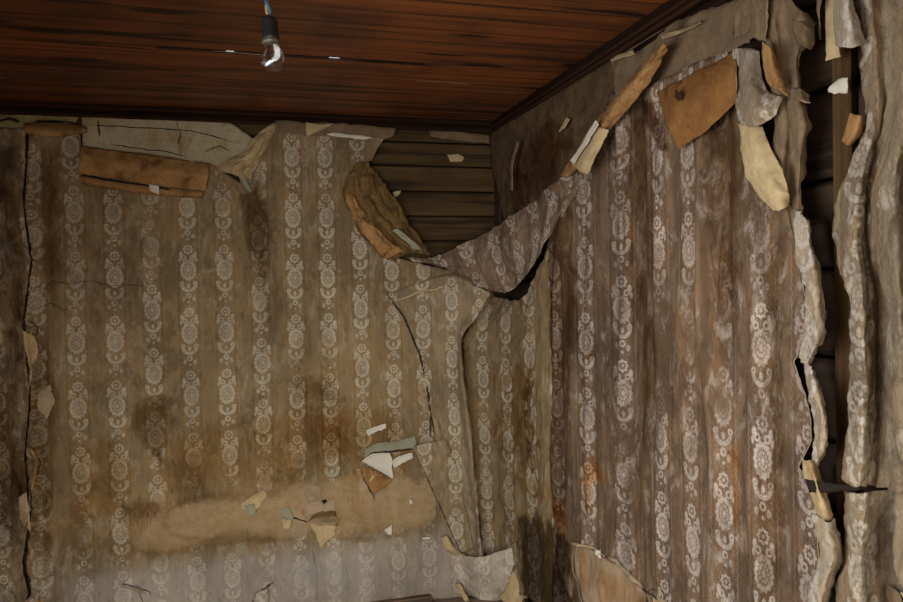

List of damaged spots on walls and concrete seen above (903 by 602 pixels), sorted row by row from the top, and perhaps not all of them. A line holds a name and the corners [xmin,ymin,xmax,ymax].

peeling [360,424,416,500]
peeling [239,489,267,516]
leakage [138,476,434,547]
peeling [279,500,339,549]
leakage [520,519,572,602]
peeling [571,542,666,602]